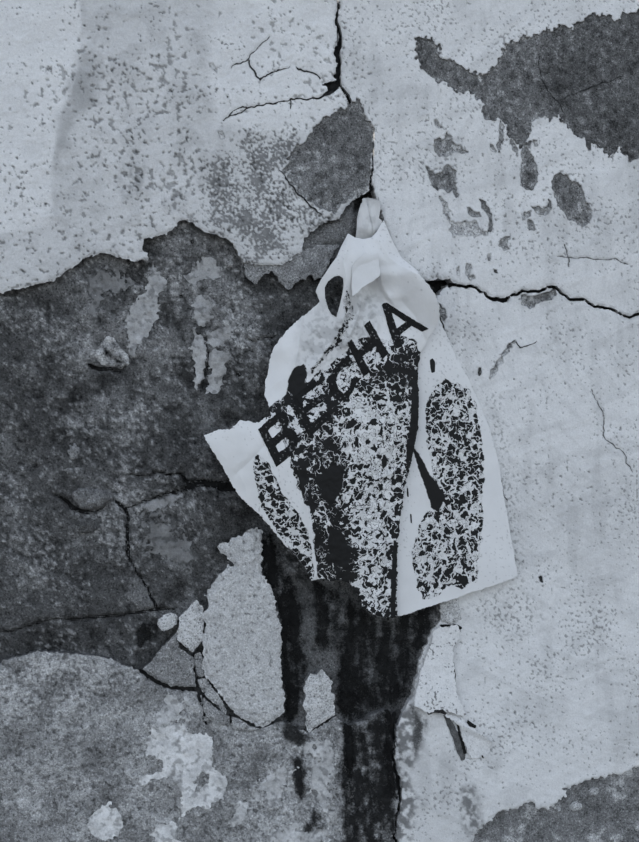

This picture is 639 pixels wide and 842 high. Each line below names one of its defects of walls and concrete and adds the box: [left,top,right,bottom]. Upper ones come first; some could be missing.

crack [223,6,351,121]
spalling [282,98,375,214]
peeling [415,9,639,190]
peeling [522,173,592,231]
crack [446,283,639,319]
crack [0,471,236,632]
water stain [261,534,309,746]
water stain [292,757,307,800]
water stain [304,810,324,833]
water stain [313,581,435,842]
crack [391,711,401,842]
peeling [414,625,492,759]